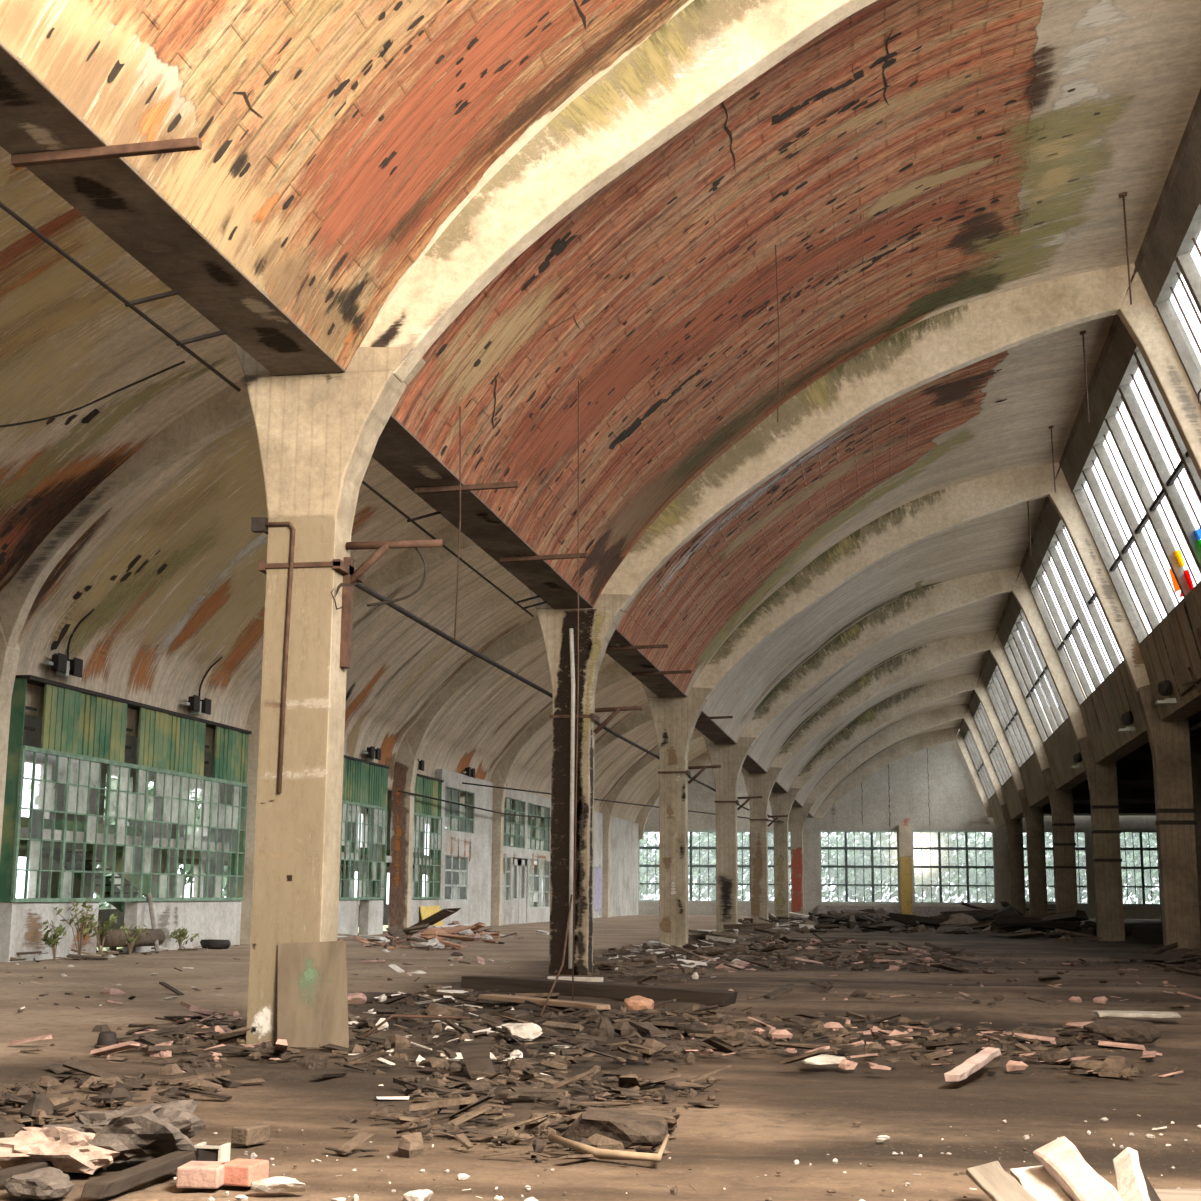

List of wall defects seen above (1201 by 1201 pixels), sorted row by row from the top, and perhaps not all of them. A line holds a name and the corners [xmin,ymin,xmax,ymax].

peeling [22,123,62,151]
peeling [74,176,126,210]
peeling [90,0,689,371]
leakage [425,0,763,258]
crack [722,101,735,167]
peeling [392,0,1132,607]
leakage [630,98,1129,553]
crack [870,30,893,105]
peeling [615,350,1009,694]